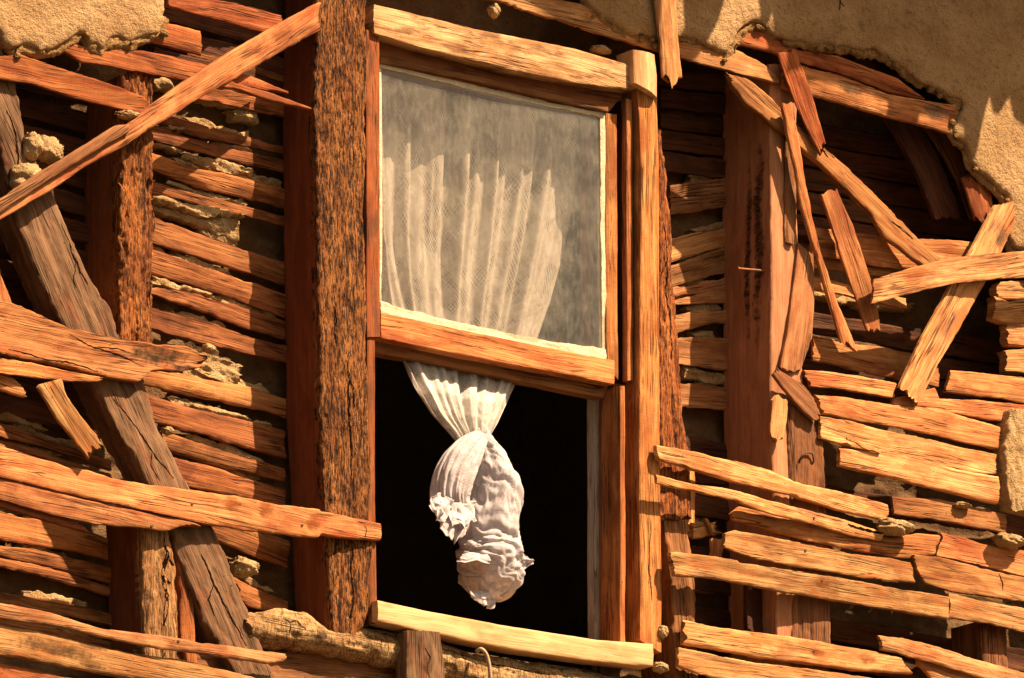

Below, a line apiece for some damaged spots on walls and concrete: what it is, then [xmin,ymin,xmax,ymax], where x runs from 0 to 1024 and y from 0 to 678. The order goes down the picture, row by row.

spalling [0,16,169,59]
spalling [582,1,659,50]
spalling [678,23,1011,205]
crack [111,396,174,478]